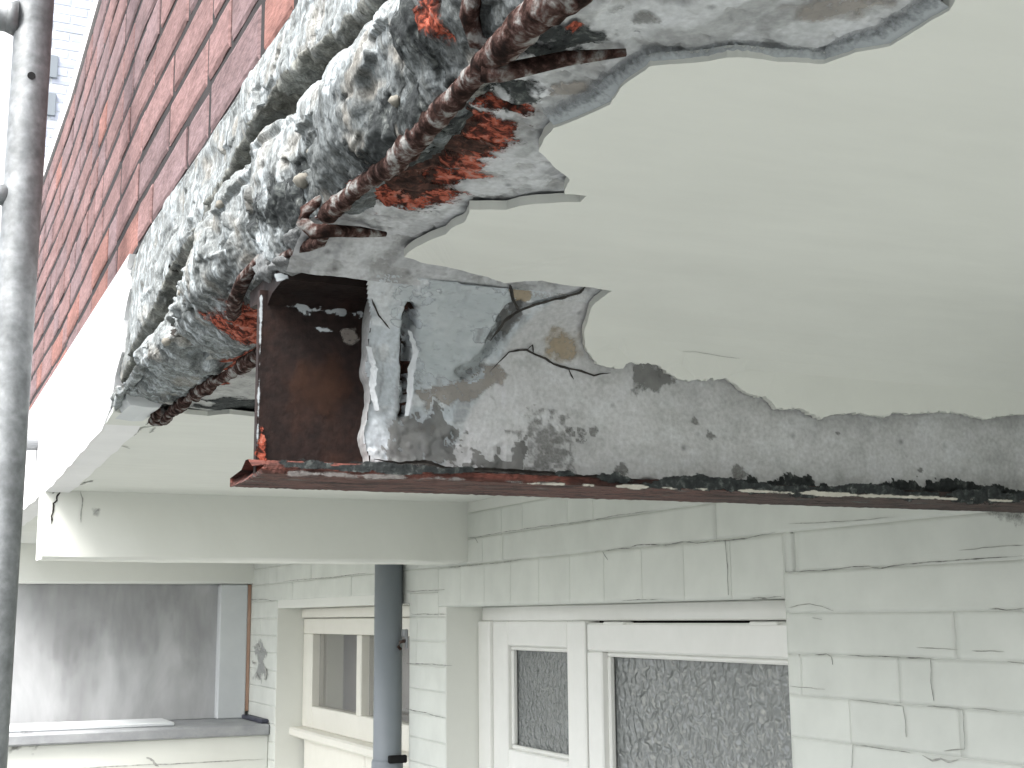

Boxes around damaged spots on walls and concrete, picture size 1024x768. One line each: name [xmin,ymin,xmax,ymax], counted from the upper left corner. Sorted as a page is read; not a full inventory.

corrosion [374,92,535,212]
spalling [110,0,1024,491]
crack [51,481,93,523]
corrosion [255,426,475,481]
corrosion [397,302,414,416]
water stain [381,364,528,474]
water stain [482,289,531,351]
crack [490,285,609,379]
water stain [633,363,675,394]
corrosion [596,472,1024,505]
crack [791,545,1020,572]
crack [816,647,1024,763]